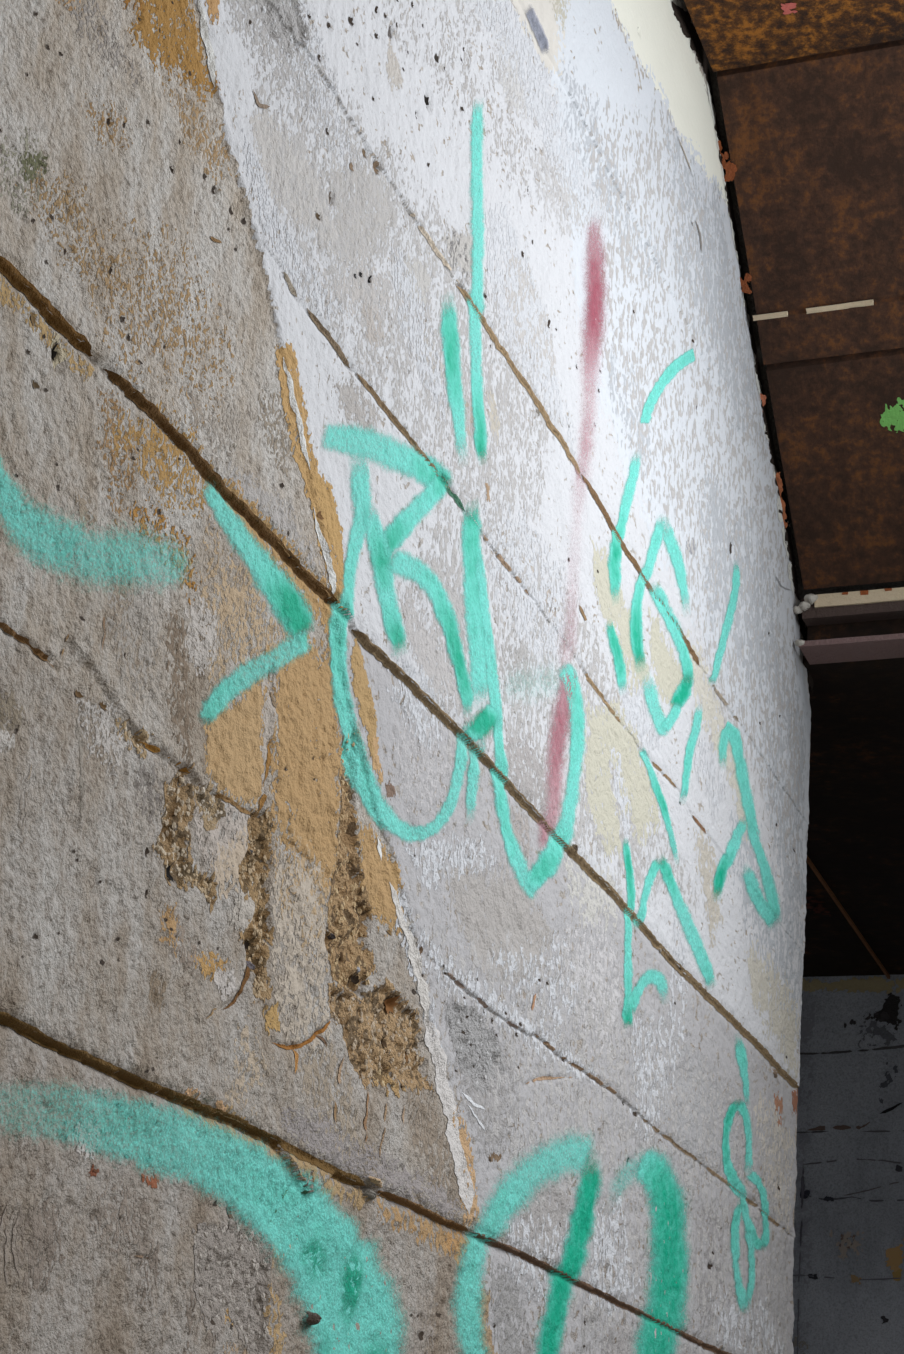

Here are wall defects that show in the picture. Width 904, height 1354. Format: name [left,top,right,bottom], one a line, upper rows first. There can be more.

crack [672,1,814,693]
crack [0,202,904,1094]
spalling [152,762,226,914]
spalling [238,806,275,1011]
crack [0,1012,732,1354]
crack [643,1102,904,1354]